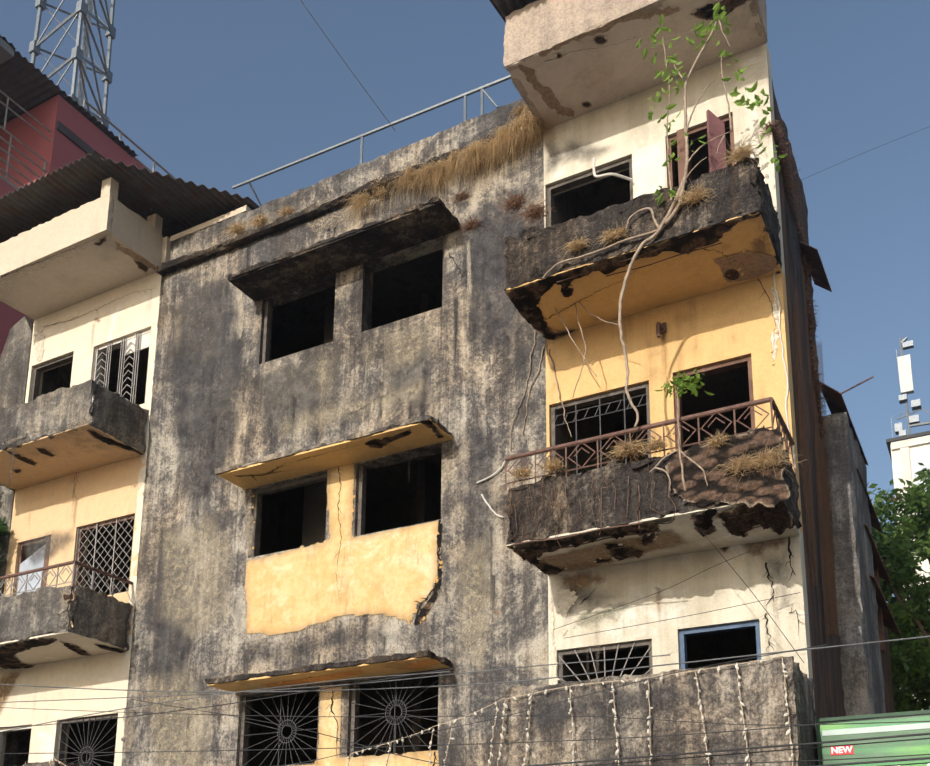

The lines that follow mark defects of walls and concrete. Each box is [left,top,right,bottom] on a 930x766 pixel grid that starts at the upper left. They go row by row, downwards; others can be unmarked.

flaking render [539,0,751,59]
damp [465,196,524,346]
spalling [505,214,754,340]
damp [176,283,244,502]
damp [262,364,319,444]
spalling [0,638,126,669]
damp [154,531,190,755]
crack [235,445,358,595]
spalling [408,523,443,625]
damp [467,427,495,606]
spalling [507,518,675,575]
crack [759,537,808,727]